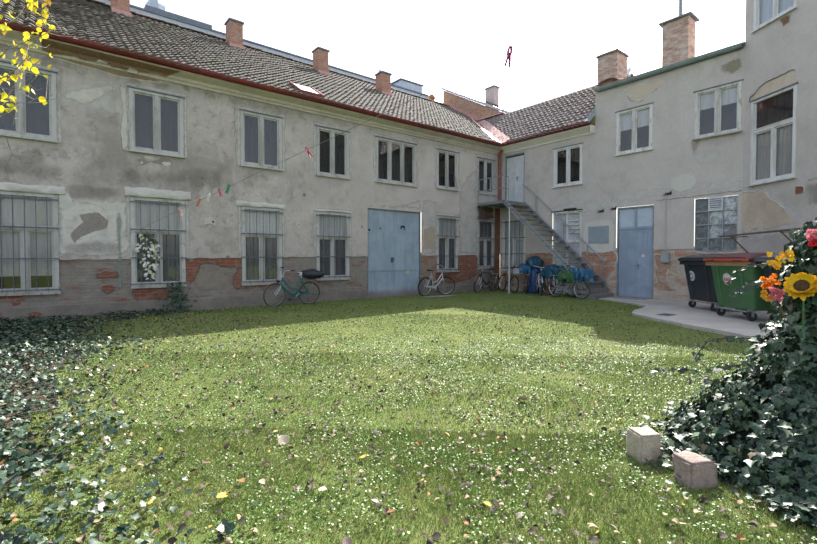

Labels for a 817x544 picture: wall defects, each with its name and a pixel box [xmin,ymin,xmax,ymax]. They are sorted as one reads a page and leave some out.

flaking render [624,80,665,102]
flaking render [749,69,799,101]
flaking render [71,201,122,242]
flaking render [741,190,794,233]
flaking render [95,270,120,295]
flaking render [129,287,180,301]
flaking render [185,255,242,290]